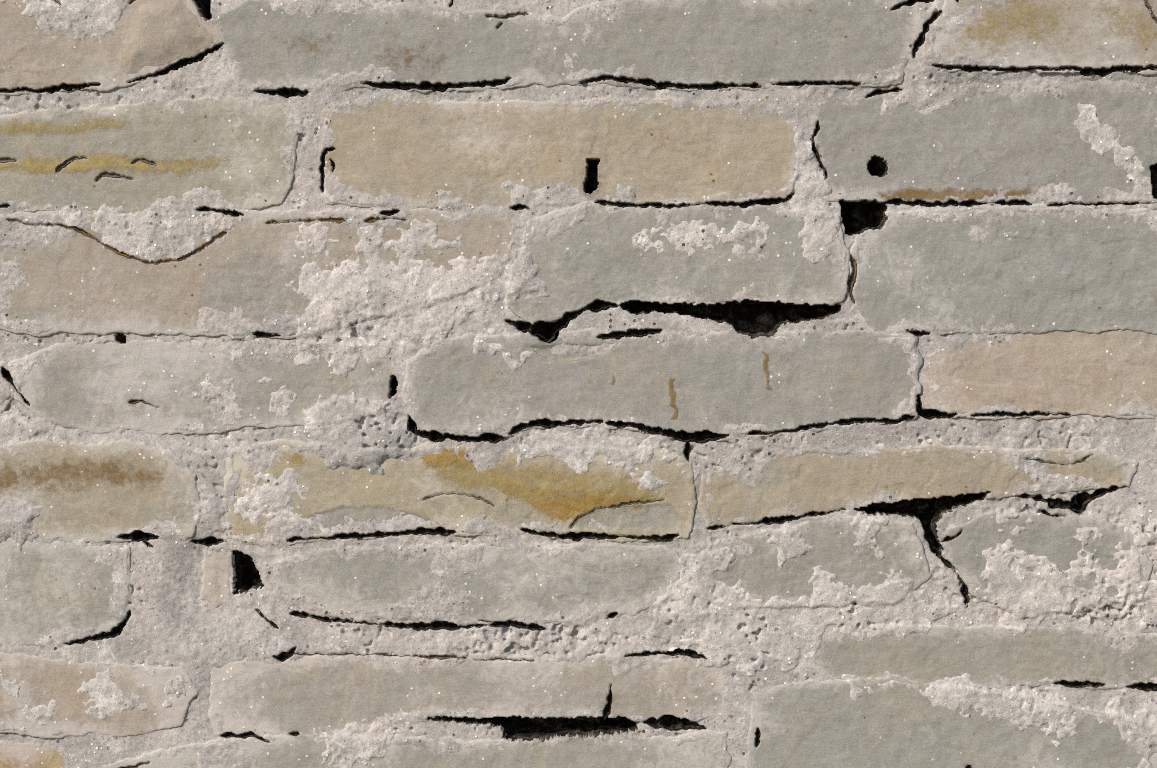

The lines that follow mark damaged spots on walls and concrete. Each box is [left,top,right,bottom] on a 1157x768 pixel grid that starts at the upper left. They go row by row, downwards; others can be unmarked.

crack [8,219,226,264]
crack [929,531,970,605]